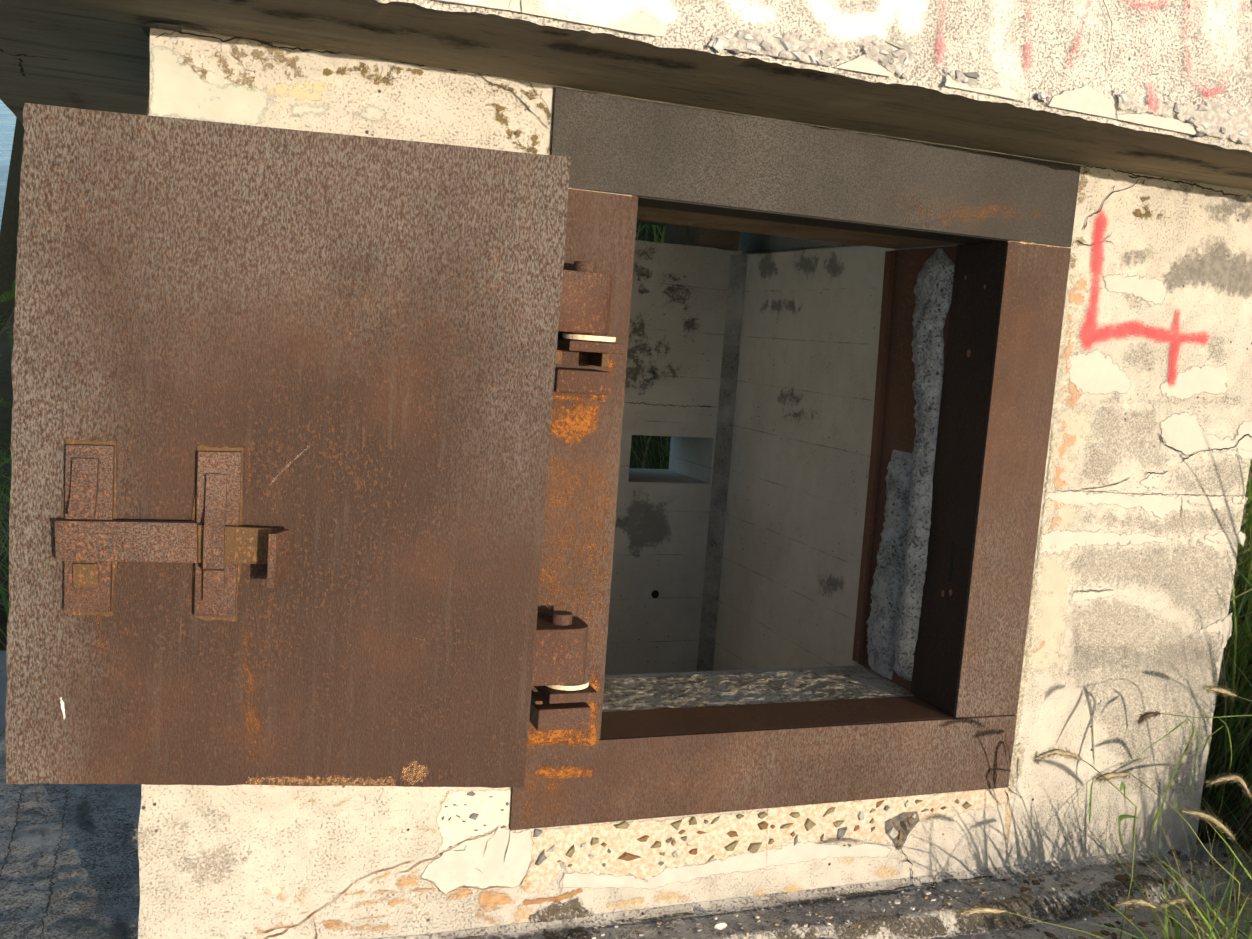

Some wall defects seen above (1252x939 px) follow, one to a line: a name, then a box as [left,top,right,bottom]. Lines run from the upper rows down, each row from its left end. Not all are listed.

damp [178,51,255,88]
damp [491,90,552,154]
damp [1164,243,1252,297]
corrosion [551,394,607,448]
spalling [866,248,955,681]
spalling [521,405,1094,894]
corrosion [528,681,598,747]
corrosion [249,761,428,787]
crack [0,787,23,877]
crack [39,787,68,939]
crack [264,828,528,939]
spalling [436,789,511,856]